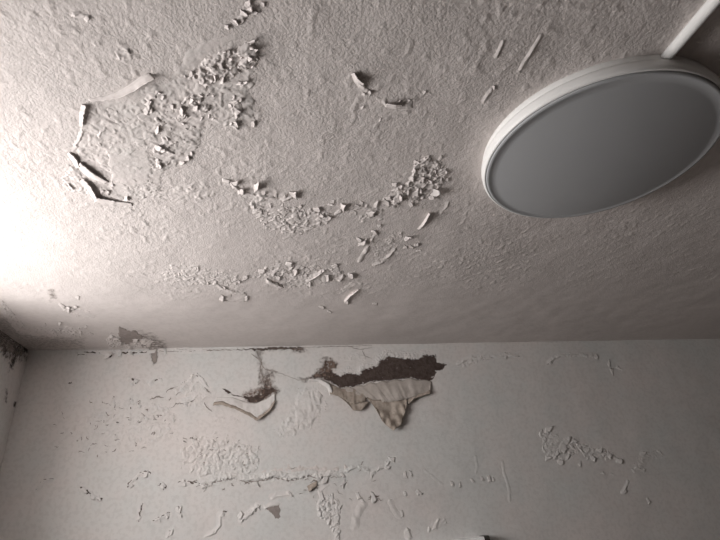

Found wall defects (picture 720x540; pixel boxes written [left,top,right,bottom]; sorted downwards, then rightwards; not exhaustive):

peeling [61,0,452,267]
peeling [159,261,374,305]
spalling [99,326,164,359]
spalling [308,348,447,431]
peeling [150,370,396,540]